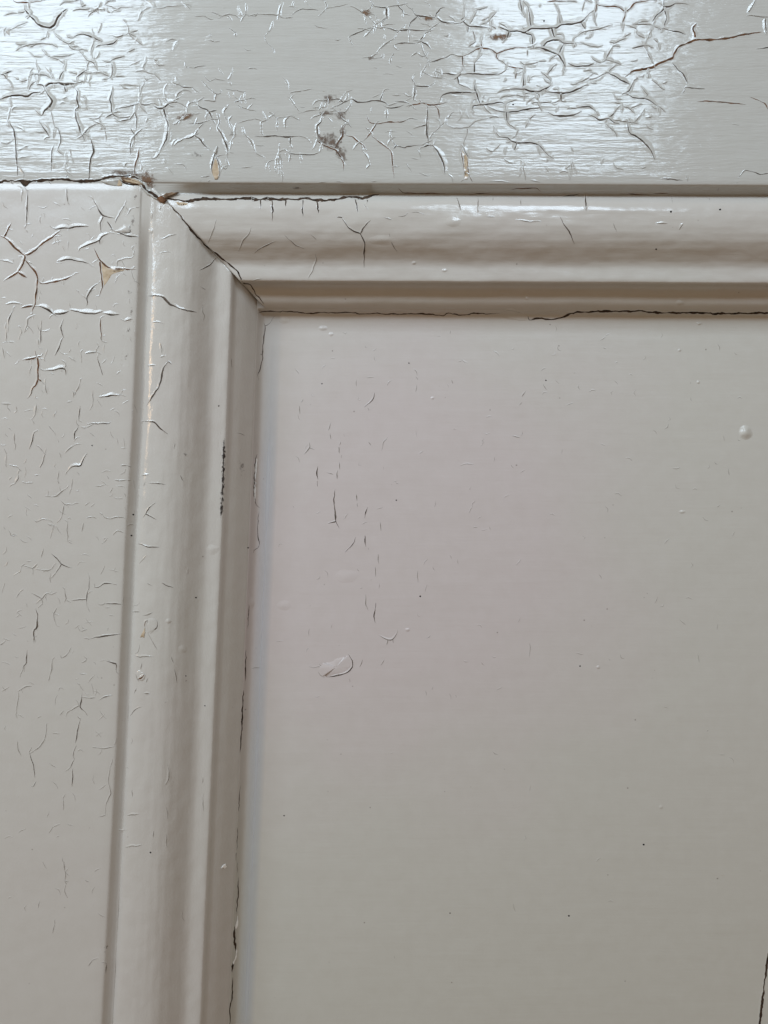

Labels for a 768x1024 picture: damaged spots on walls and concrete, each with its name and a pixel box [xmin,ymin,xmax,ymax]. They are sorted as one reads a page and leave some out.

spalling [210,146,221,180]
crack [0,0,768,787]
crack [47,648,133,837]
crack [228,785,241,1024]
crack [757,947,768,1024]